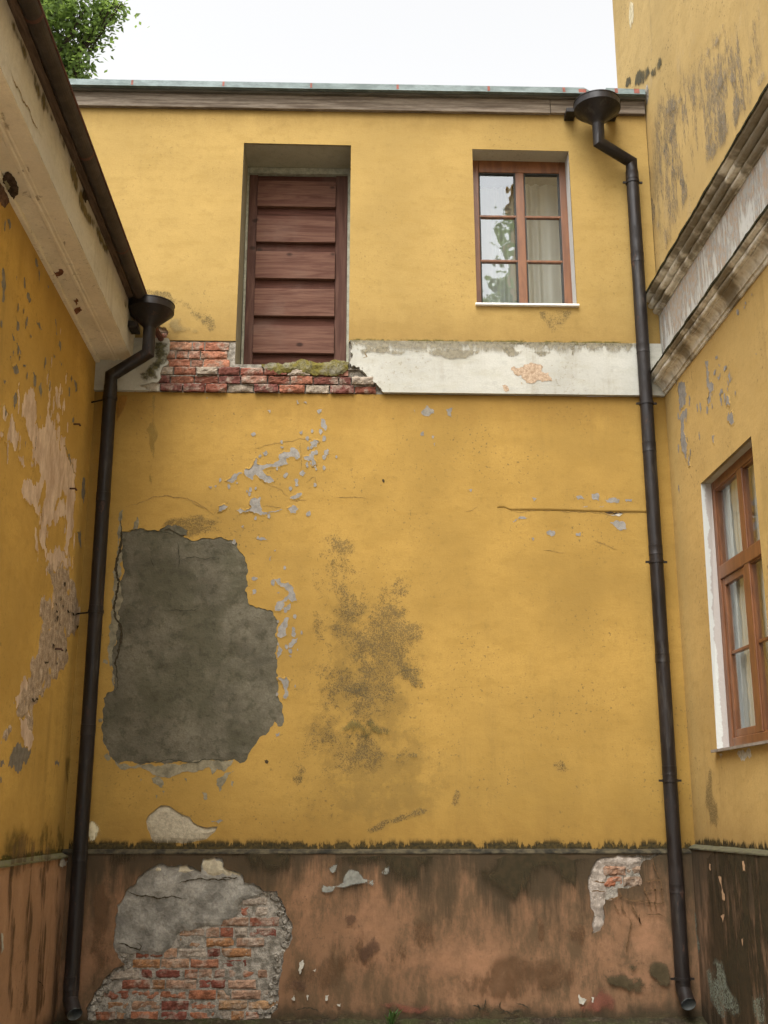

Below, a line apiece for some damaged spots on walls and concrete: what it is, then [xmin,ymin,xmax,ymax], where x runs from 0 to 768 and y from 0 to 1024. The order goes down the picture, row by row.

damp [660,146,768,349]
peeling [209,409,337,528]
peeling [0,266,86,783]
crack [518,509,635,517]
flaking render [141,776,223,843]
damp [0,836,73,1017]
peeling [179,857,241,876]
peeling [322,865,373,892]
damp [88,821,667,899]
spalling [588,854,659,933]
damp [682,839,768,1024]
damp [464,959,573,1020]